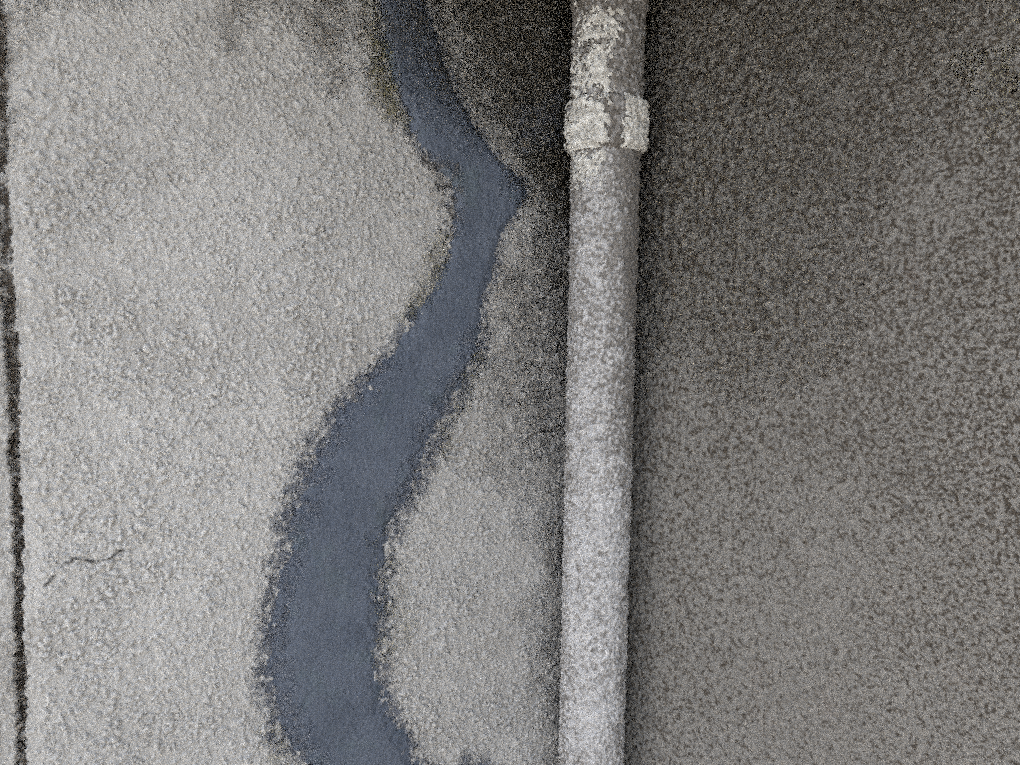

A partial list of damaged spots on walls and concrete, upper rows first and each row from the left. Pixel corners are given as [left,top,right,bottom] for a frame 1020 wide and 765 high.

damp [466,0,573,207]